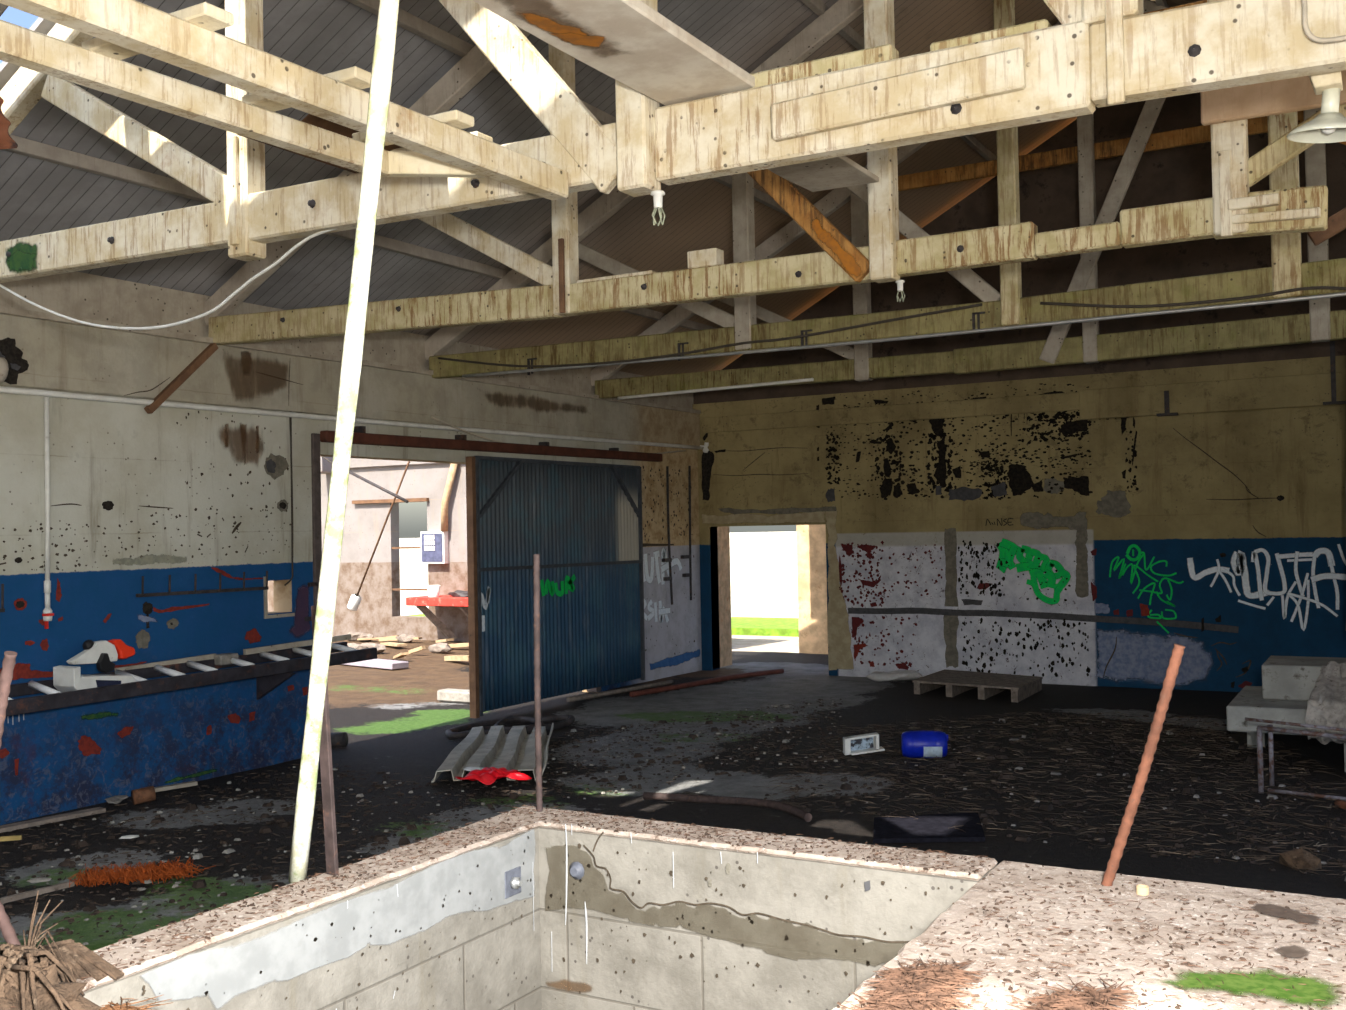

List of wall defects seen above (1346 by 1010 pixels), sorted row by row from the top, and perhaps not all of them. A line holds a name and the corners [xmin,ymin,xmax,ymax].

spalling [0,337,29,385]
peeling [816,387,993,410]
peeling [816,410,1139,502]
peeling [839,541,943,670]
peeling [943,540,1221,886]
damp [545,832,910,966]